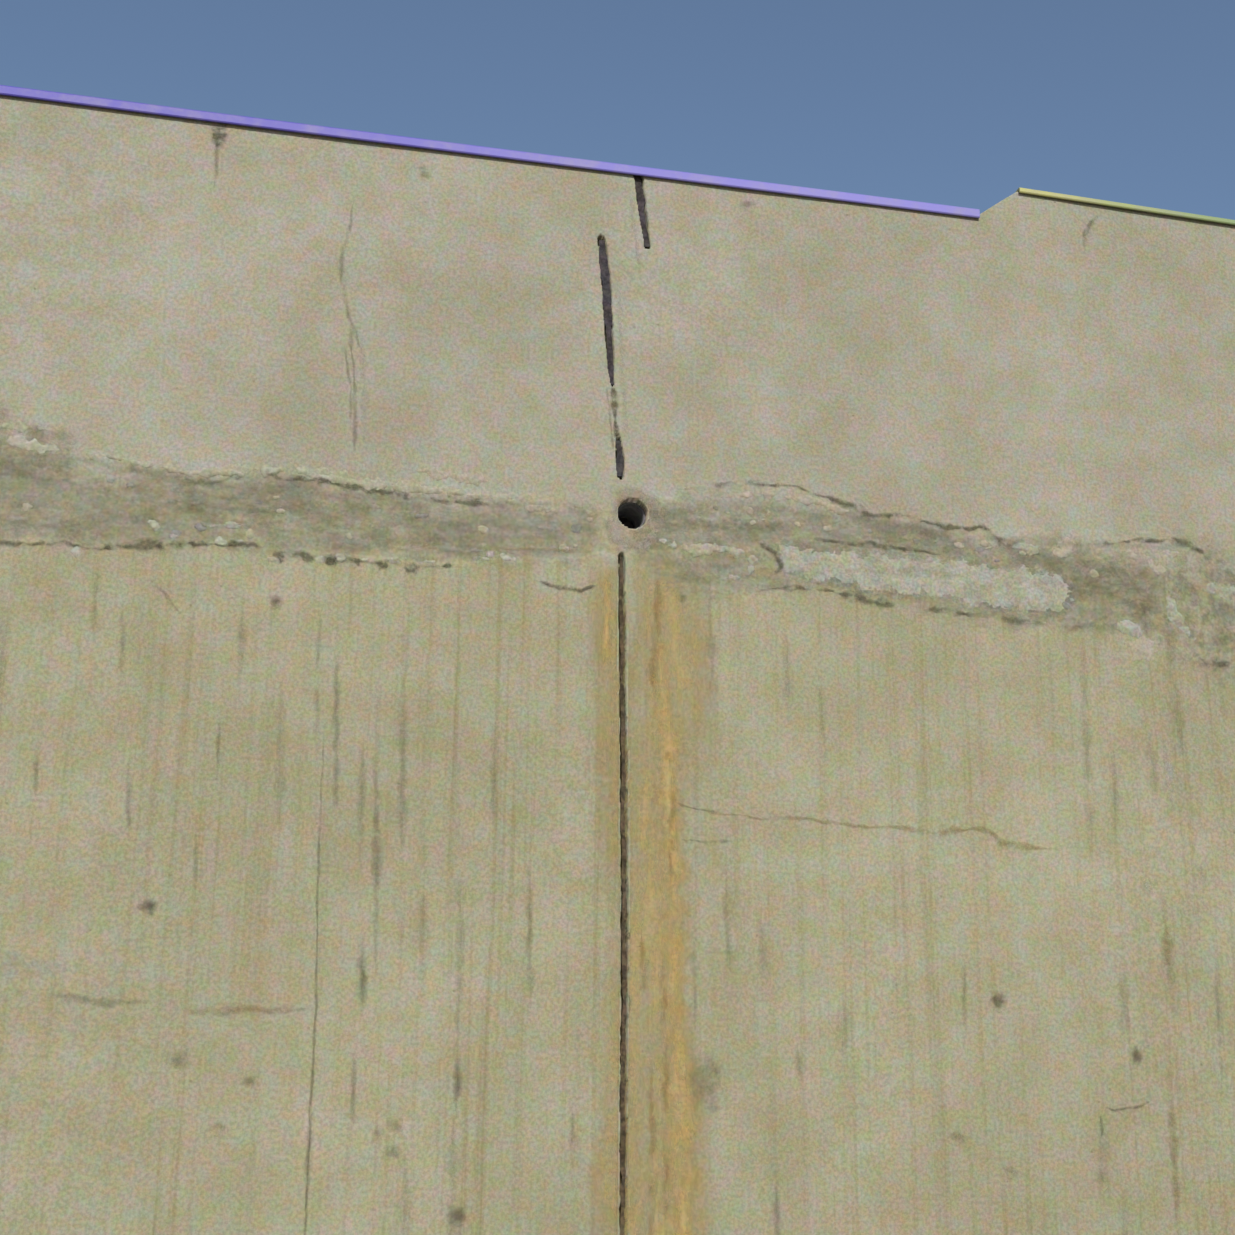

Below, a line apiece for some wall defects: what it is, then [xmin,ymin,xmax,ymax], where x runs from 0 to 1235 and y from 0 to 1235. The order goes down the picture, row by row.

crack [633,175,650,247]
crack [599,240,624,476]
peeling [0,421,63,457]
spalling [86,451,558,530]
spalling [102,519,257,549]
spalling [267,552,451,571]
spalling [657,538,783,581]
spalling [697,484,1099,578]
spalling [1124,538,1203,579]
peeling [1115,619,1144,639]
crack [619,557,629,1235]
corrosion [602,577,703,1235]